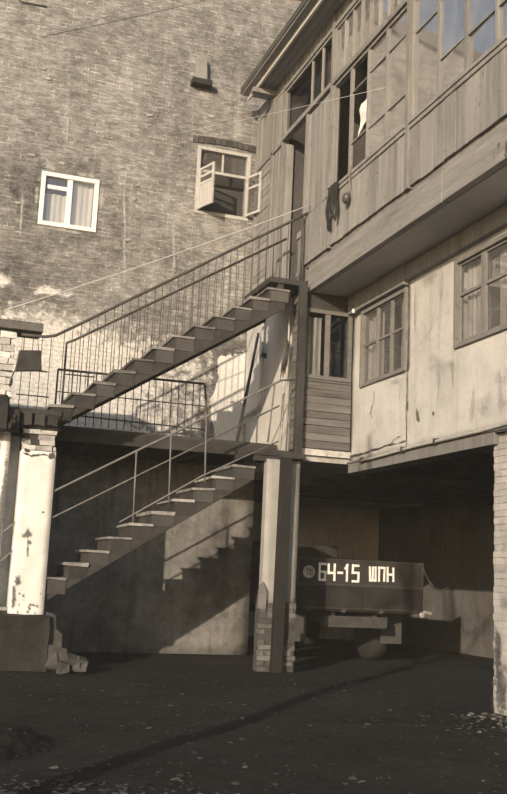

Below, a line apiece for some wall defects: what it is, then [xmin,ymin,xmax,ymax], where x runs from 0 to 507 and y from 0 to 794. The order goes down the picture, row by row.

peeling [0,284,170,410]
peeling [63,351,246,441]
water stain [492,632,506,714]